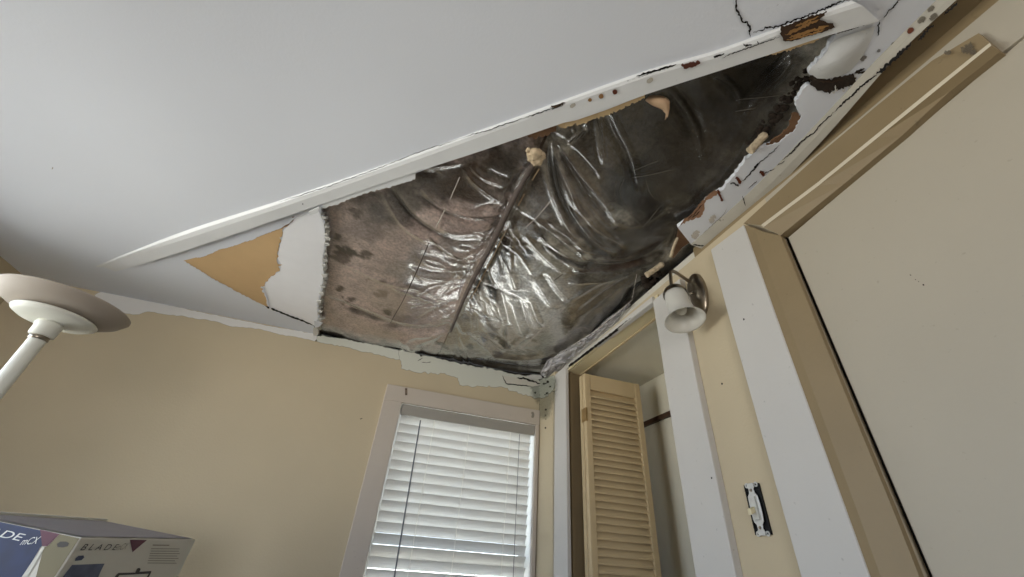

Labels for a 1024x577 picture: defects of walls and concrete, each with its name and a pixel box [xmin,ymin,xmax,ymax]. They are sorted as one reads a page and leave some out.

peeling [645,95,670,120]
crack [724,0,957,188]
peeling [263,211,331,336]
flaking render [502,374,543,387]